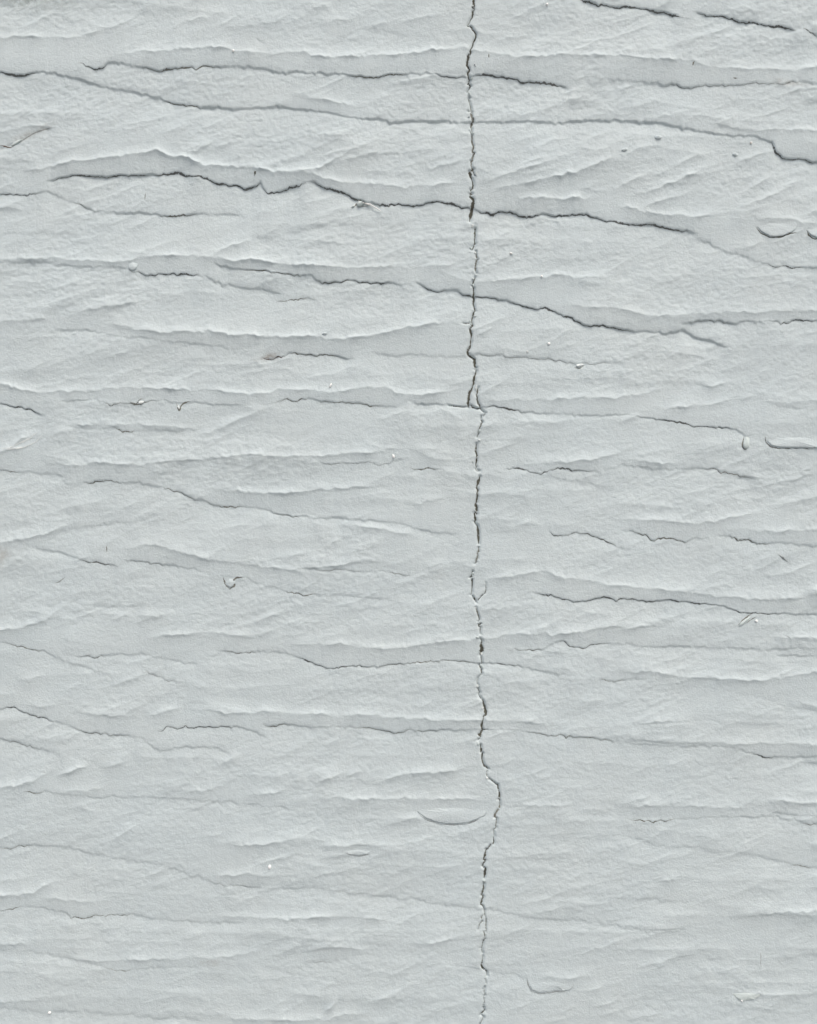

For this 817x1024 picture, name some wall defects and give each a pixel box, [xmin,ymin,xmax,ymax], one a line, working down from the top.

crack [1,70,32,78]
crack [770,142,811,163]
peeling [758,223,817,240]
peeling [765,437,817,449]
crack [54,0,688,1022]
crack [537,593,782,623]